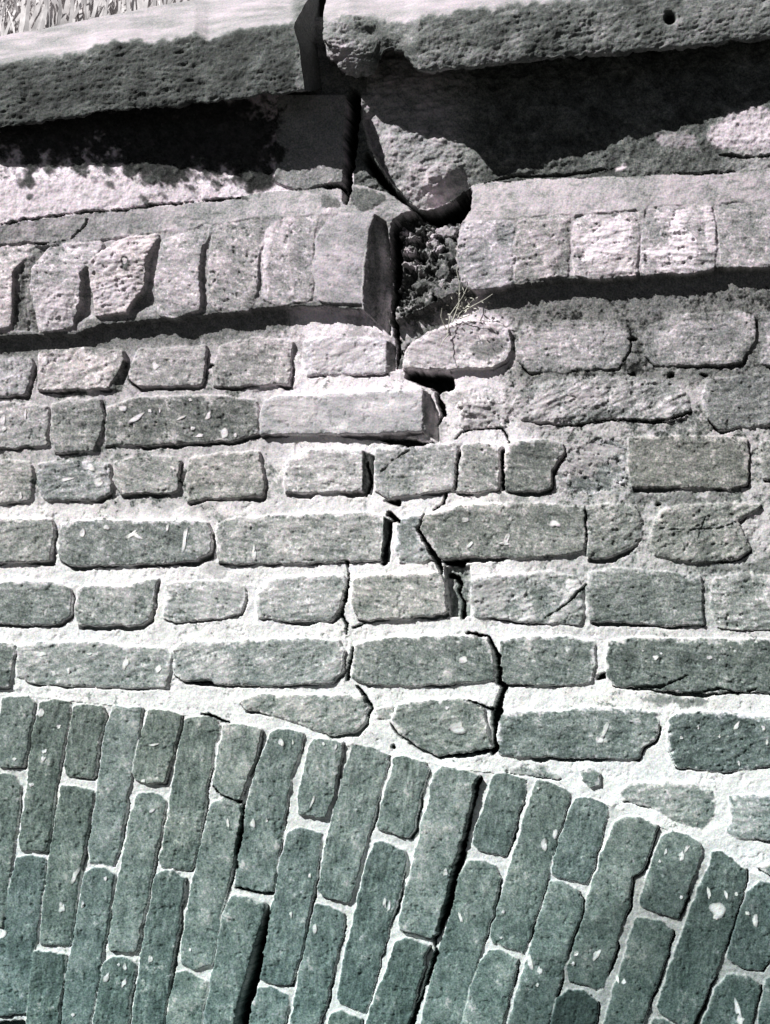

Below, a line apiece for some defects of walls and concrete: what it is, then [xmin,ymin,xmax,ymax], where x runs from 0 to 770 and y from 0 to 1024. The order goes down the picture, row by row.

crack [365,426,510,1024]
crack [544,583,587,620]